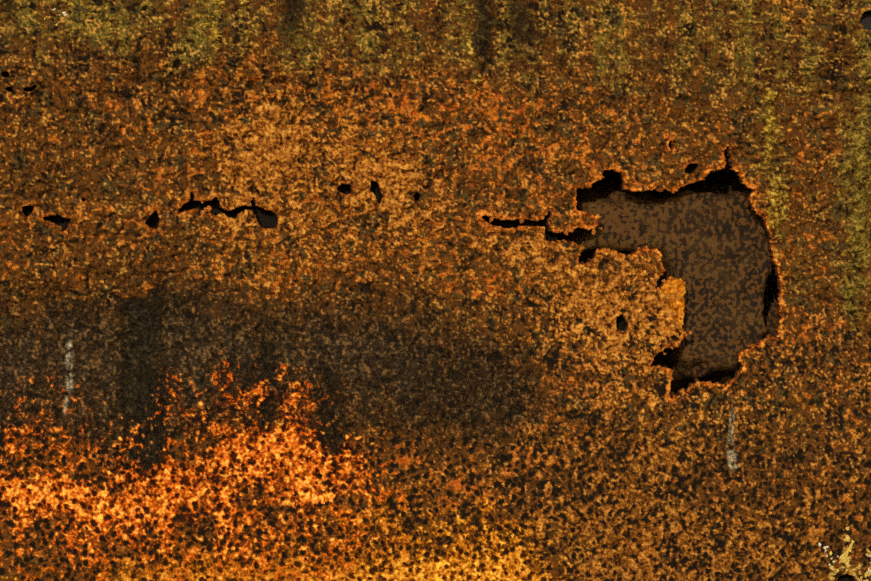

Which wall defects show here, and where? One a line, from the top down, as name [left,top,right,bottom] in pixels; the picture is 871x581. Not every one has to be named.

water stain [202,0,227,50]
rust [767,0,813,40]
rust [168,64,457,298]
spalling [337,184,351,195]
spalling [370,181,383,203]
spalling [42,215,71,231]
spalling [145,211,159,229]
crack [476,205,560,243]
spalling [616,315,627,331]
water stain [0,279,520,488]
rust [0,222,841,581]